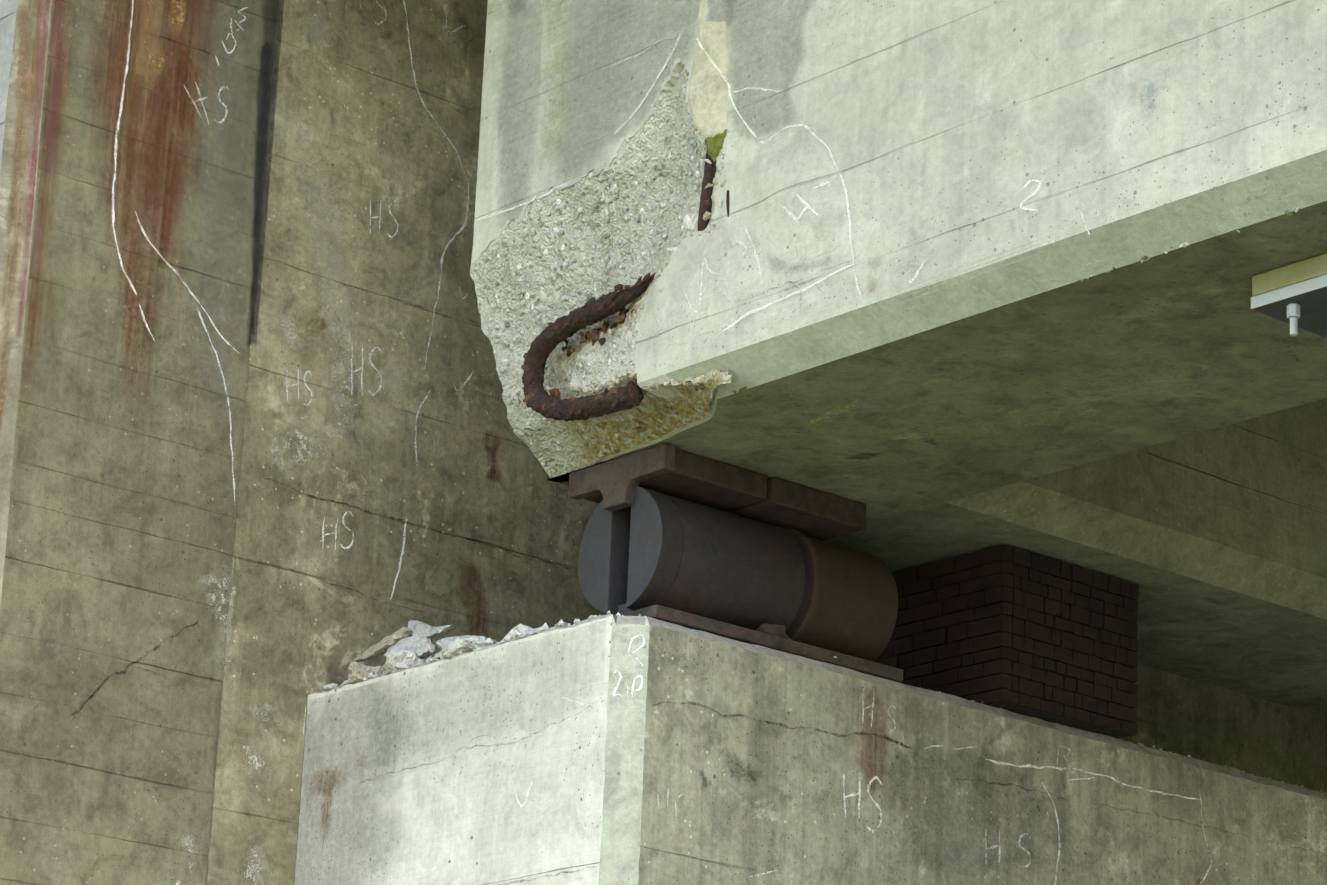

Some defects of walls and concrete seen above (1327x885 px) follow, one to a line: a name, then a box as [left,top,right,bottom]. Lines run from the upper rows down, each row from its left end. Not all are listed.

corrosion [7,0,61,280]
corrosion [104,0,187,346]
corrosion [521,272,651,415]
spalling [470,84,747,486]
spalling [1078,241,1189,282]
crack [72,621,198,715]